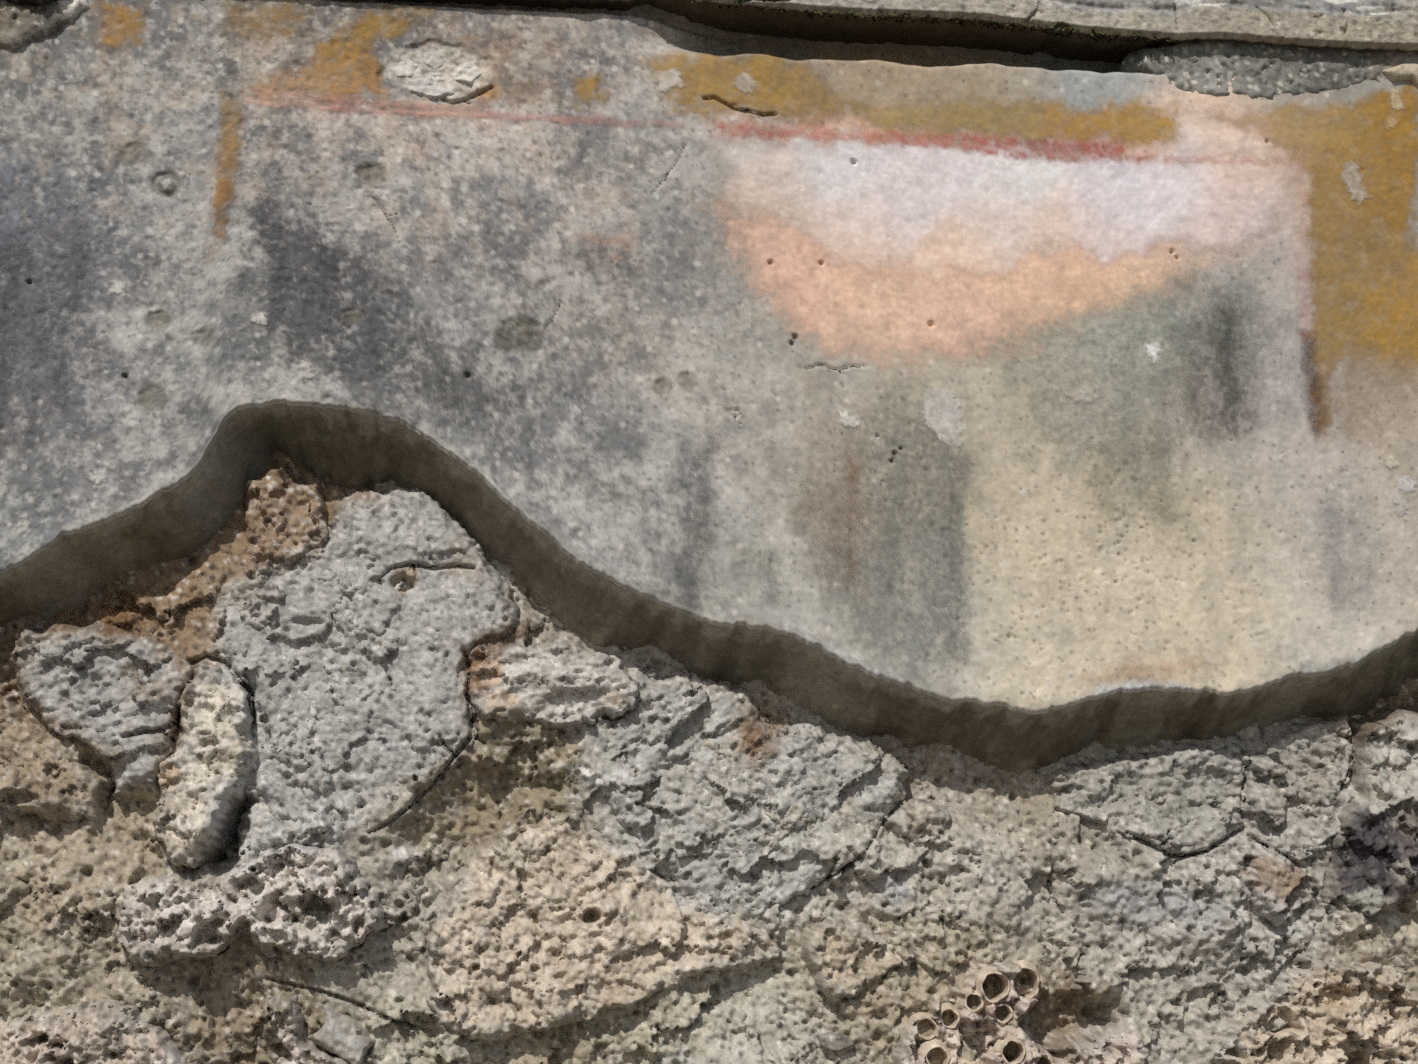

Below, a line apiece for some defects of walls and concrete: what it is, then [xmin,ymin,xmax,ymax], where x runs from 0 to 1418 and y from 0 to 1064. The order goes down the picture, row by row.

spalling [384,45,494,105]
damp [248,197,525,422]
crack [380,563,469,581]
spalling [0,403,1418,776]
crack [370,651,484,834]
crack [1129,759,1303,867]